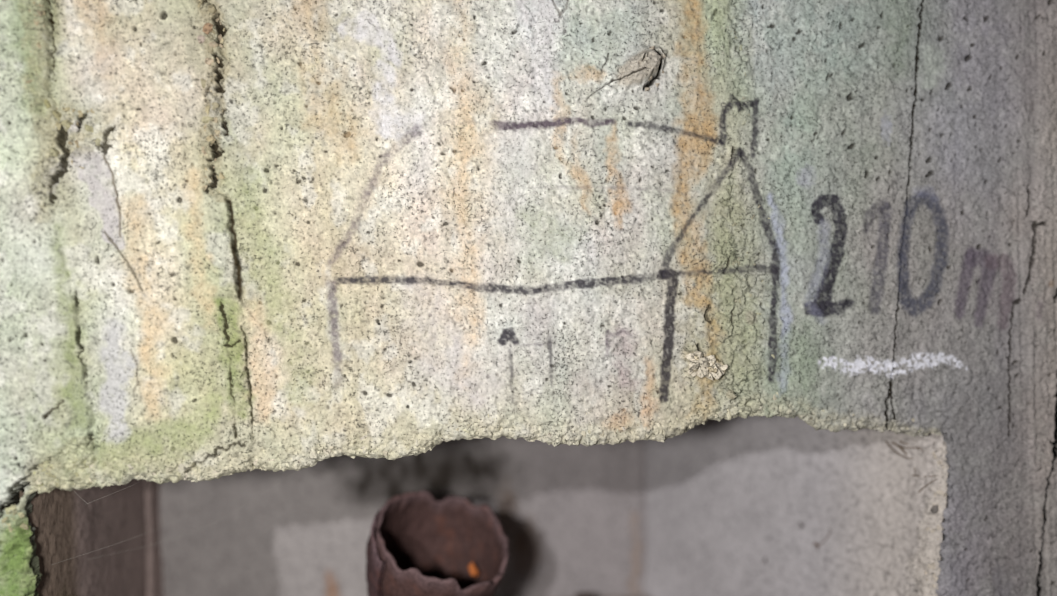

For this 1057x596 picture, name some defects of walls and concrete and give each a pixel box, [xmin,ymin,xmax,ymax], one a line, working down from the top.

crack [44,0,57,92]
crack [46,109,118,205]
crack [183,0,255,479]
spalling [1,185,949,596]
corrosion [667,0,719,359]
crack [884,292,900,431]
crack [905,0,926,197]
crack [1007,184,1048,437]
crack [1036,368,1057,596]